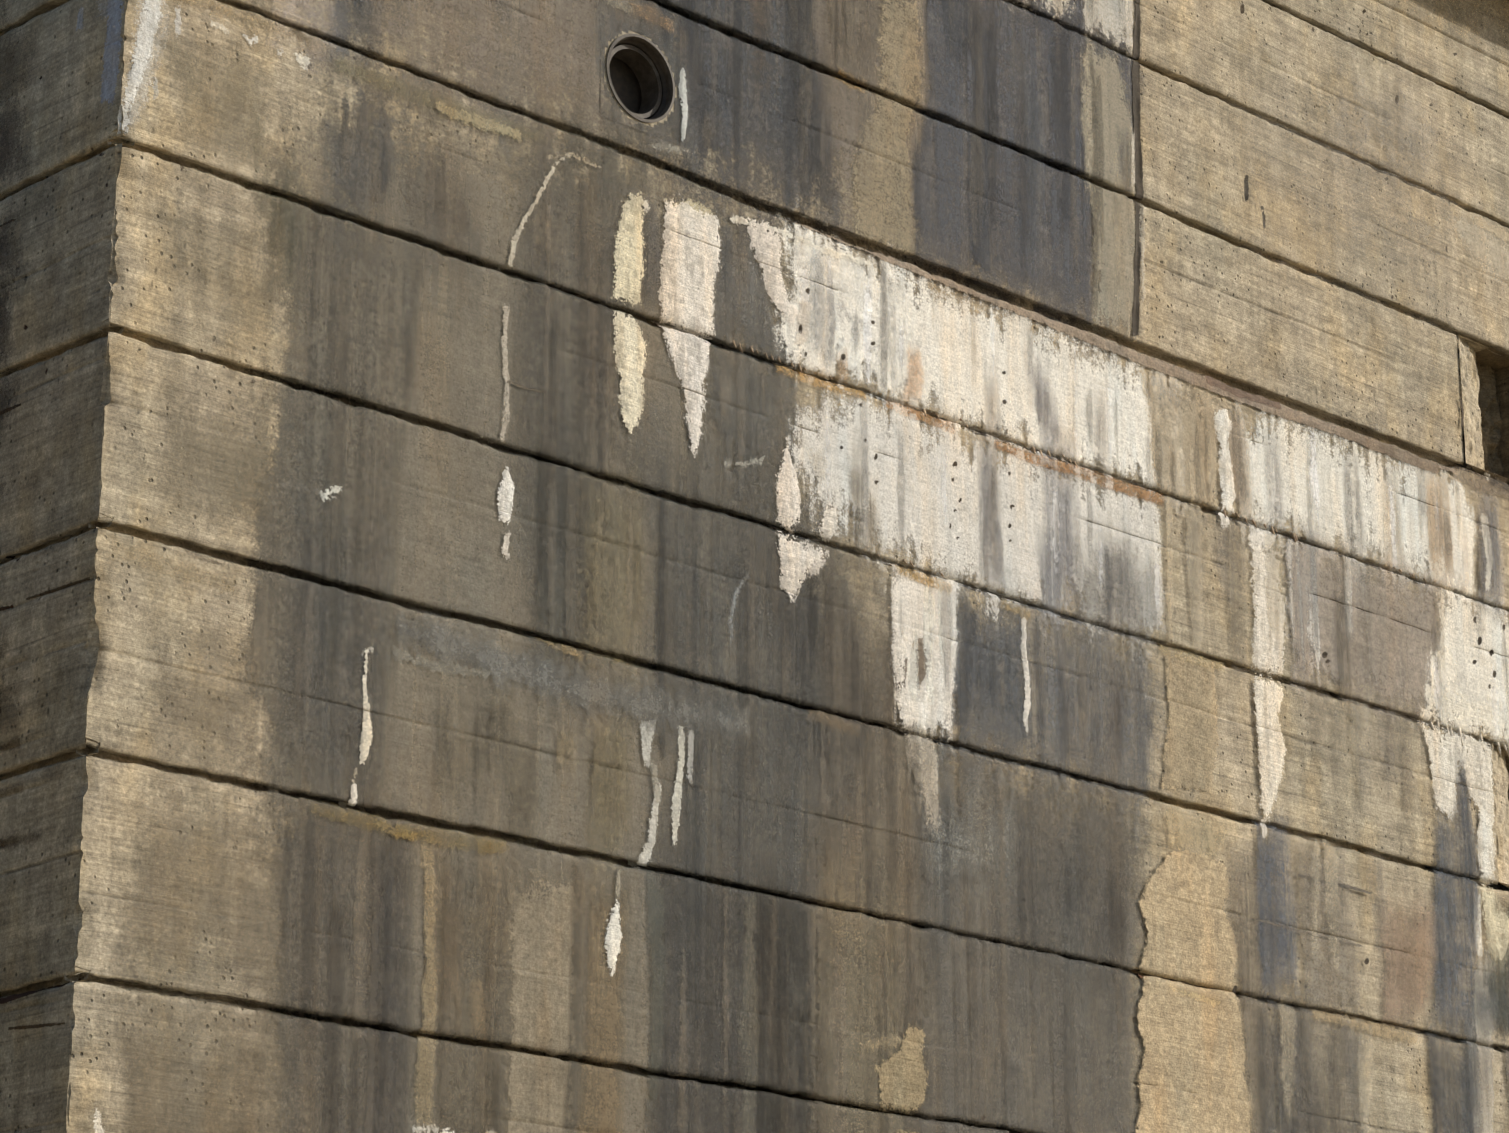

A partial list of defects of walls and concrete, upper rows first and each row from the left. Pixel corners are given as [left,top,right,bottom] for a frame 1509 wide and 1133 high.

water stain [128,0,1218,1133]
water stain [1227,406,1509,1133]